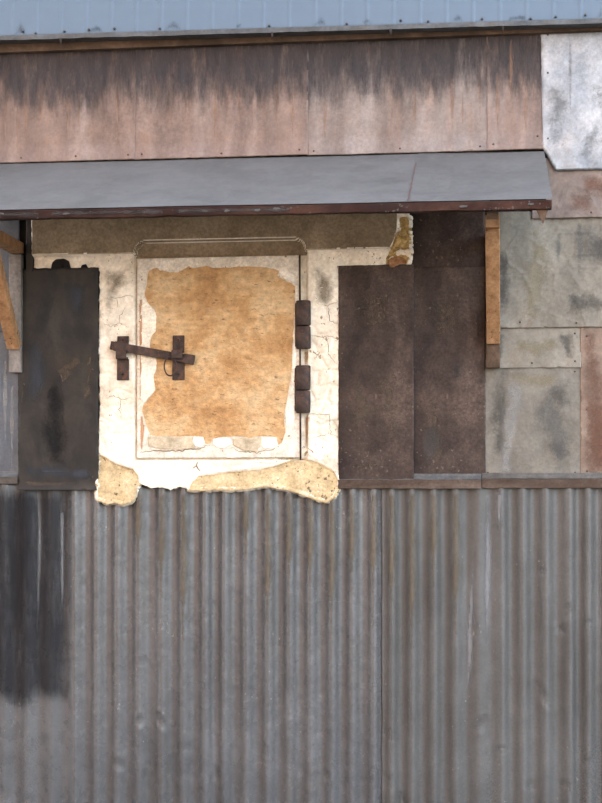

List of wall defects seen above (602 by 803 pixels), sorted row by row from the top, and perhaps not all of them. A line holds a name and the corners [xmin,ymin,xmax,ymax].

spalling [386,217,413,268]
peeling [140,266,340,504]
spalling [96,455,141,505]